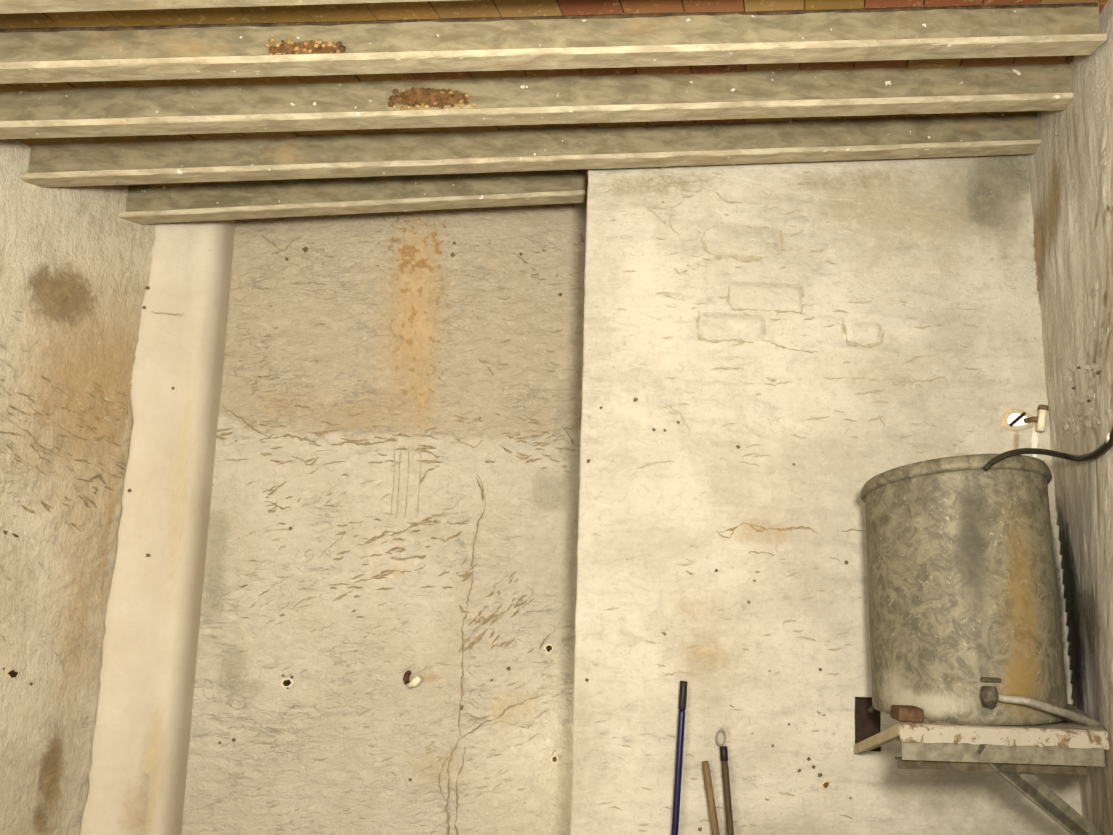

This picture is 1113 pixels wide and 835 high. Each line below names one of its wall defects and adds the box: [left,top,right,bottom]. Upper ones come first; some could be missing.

spalling [265,37,346,55]
spalling [388,87,477,110]
rust [392,220,445,293]
crack [438,474,542,835]